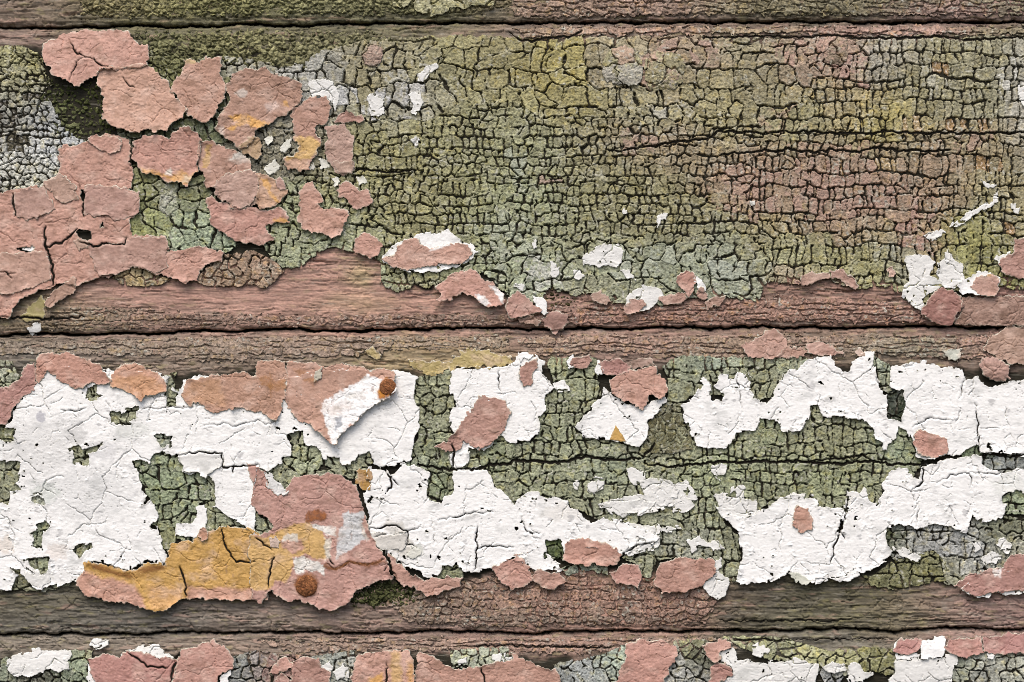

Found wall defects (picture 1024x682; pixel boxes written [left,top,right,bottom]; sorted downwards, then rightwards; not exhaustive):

crack [509,30,582,43]
crack [703,33,1024,41]
crack [606,130,1024,156]
peeling [0,29,385,336]
peeling [886,237,1024,365]
crack [418,371,1024,487]
peeling [0,328,1024,613]
crack [221,530,274,586]
crack [830,499,848,563]
peeling [86,638,234,682]
peeling [701,638,874,682]
peeling [888,631,1024,682]